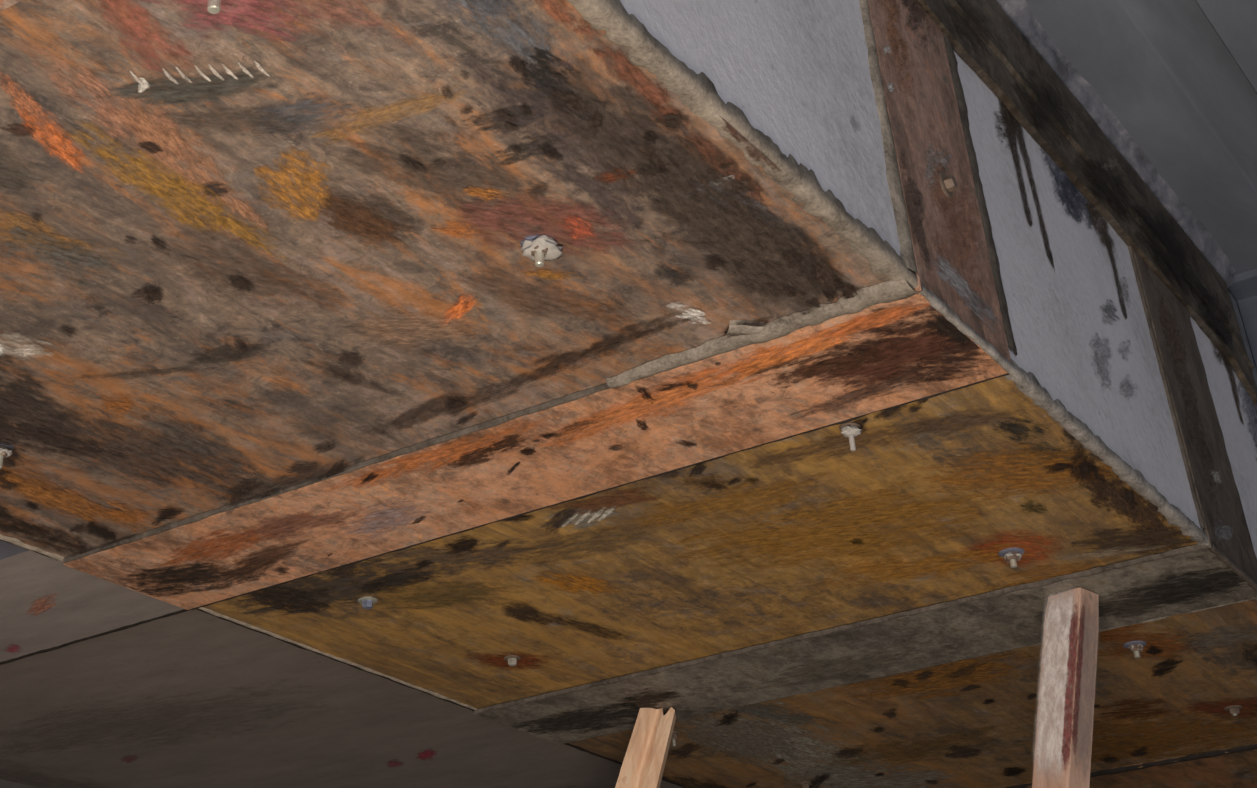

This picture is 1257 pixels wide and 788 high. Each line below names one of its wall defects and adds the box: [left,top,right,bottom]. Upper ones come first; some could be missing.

damp [722,118,779,170]
damp [656,264,698,287]
rust [973,532,1055,565]